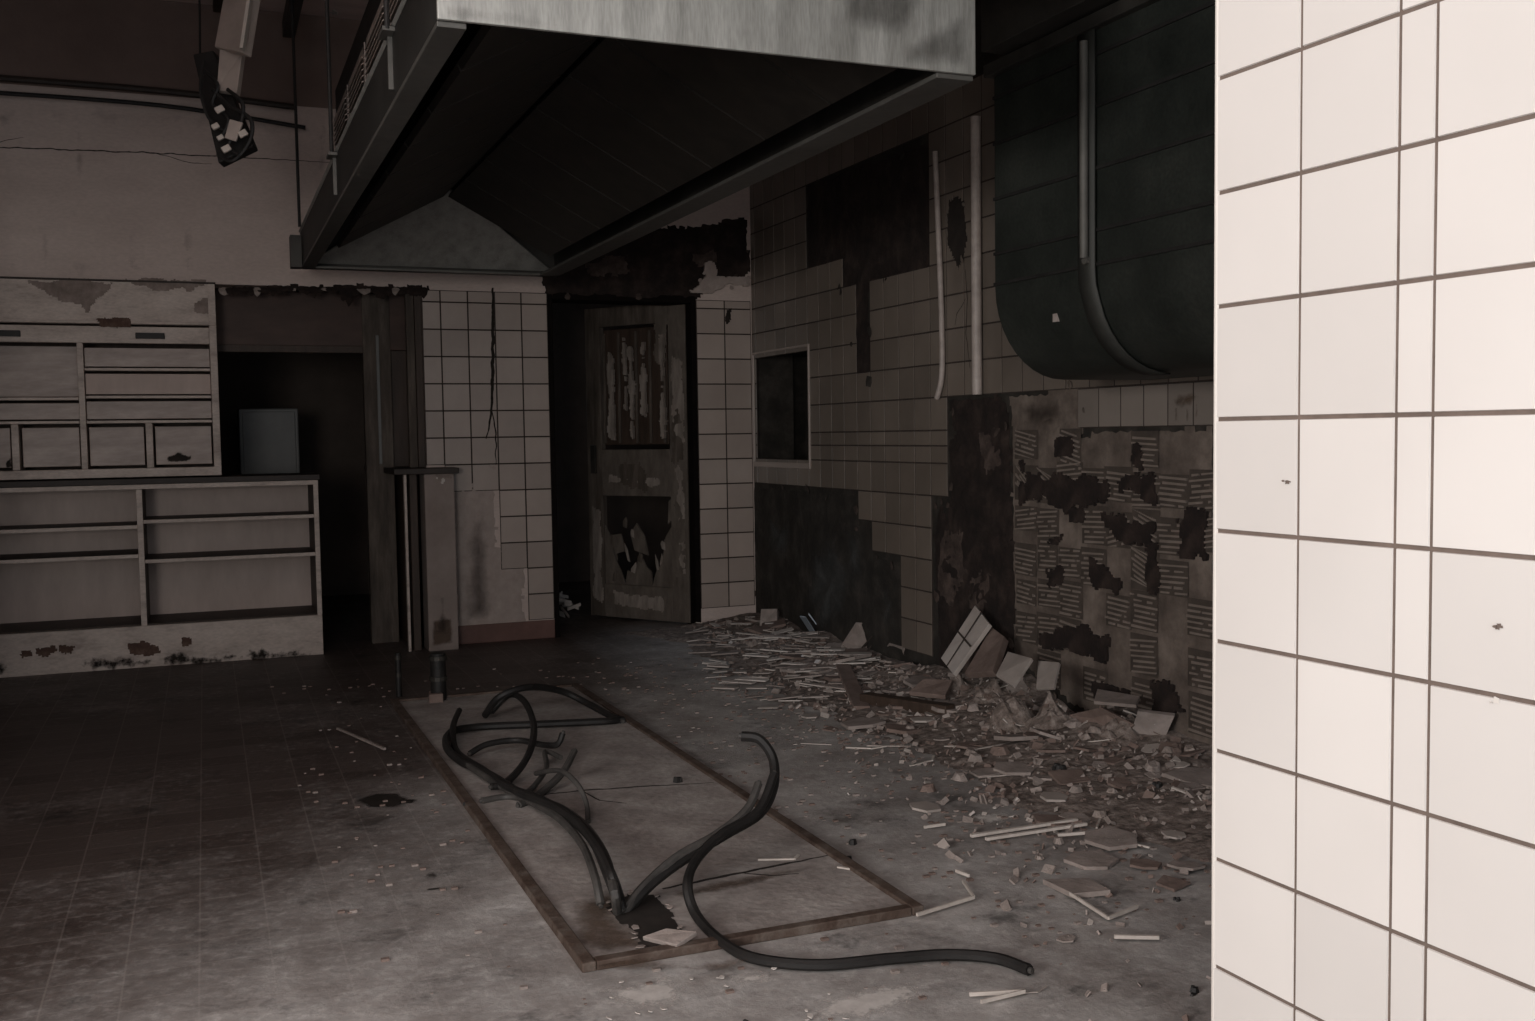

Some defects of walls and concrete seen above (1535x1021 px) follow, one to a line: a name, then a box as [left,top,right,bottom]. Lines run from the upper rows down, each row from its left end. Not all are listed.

peeling [754,484,905,661]
spalling [933,380,1084,676]
spalling [1133,709,1175,735]